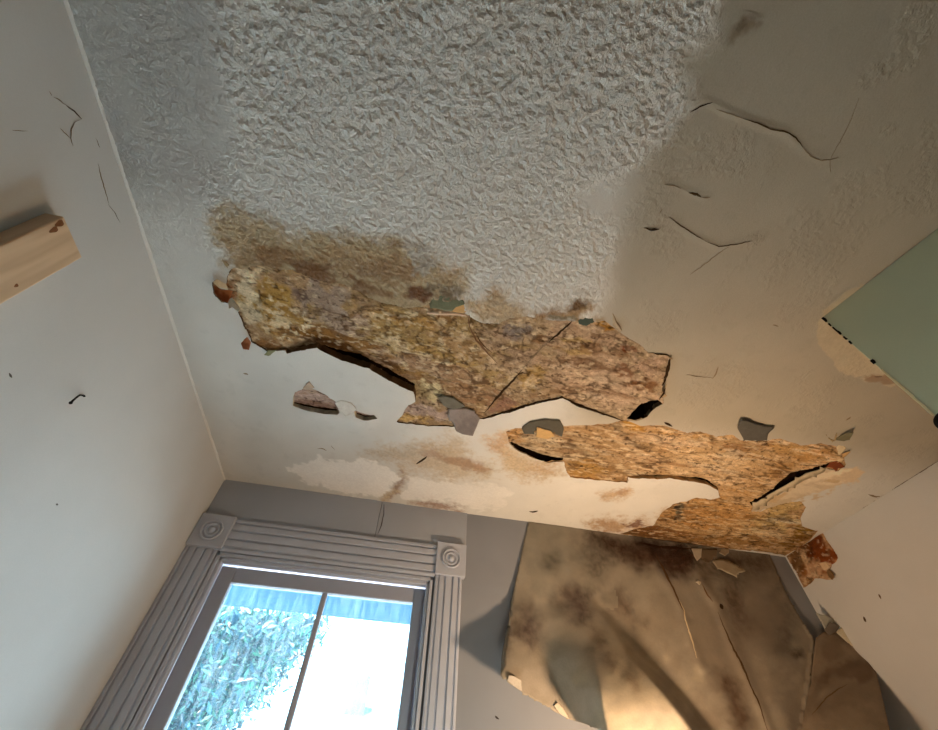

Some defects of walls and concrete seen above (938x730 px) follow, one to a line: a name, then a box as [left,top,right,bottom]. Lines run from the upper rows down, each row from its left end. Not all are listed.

crack [49,91,82,144]
crack [690,99,859,171]
crack [665,184,710,198]
damp [193,193,611,326]
crack [645,209,750,275]
peeling [212,259,868,556]
damp [342,423,573,514]
damp [573,482,696,577]